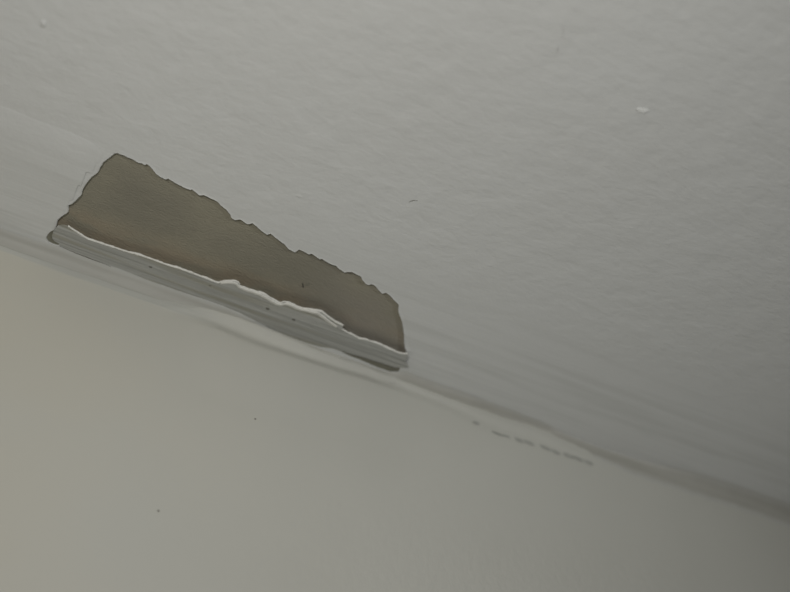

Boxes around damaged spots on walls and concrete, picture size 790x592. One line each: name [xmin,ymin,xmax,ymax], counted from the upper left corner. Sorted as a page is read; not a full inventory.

peeling [46,151,411,371]